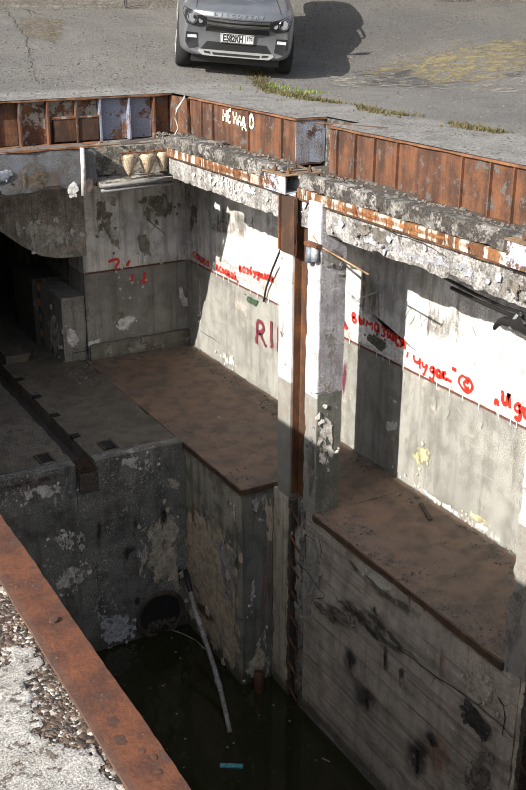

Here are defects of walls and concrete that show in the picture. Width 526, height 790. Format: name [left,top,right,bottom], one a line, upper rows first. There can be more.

peeling [323,249,345,276]
rust [323,200,455,242]
peeling [331,220,473,278]
peeling [305,404,339,496]
peeling [137,499,256,670]
leakage [350,561,425,613]
peeling [97,610,137,649]
peeling [243,625,268,683]
leakage [340,601,410,665]